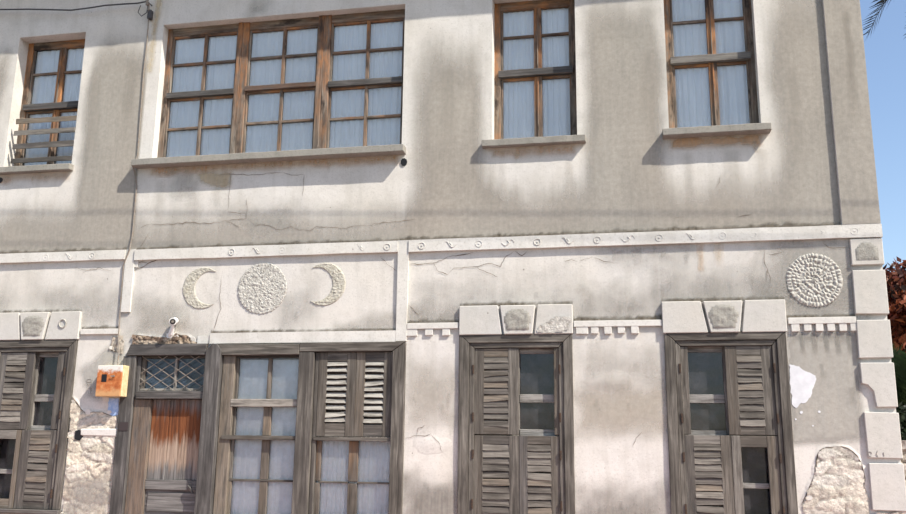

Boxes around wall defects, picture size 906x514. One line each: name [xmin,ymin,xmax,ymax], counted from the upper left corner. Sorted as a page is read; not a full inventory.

leakage [0,0,881,254]
crack [136,172,413,270]
crack [416,251,525,277]
leakage [574,301,662,321]
leakage [661,294,754,303]
leakage [765,240,855,318]
flaking render [789,364,816,420]
spalling [61,396,118,514]
spalling [799,443,906,514]